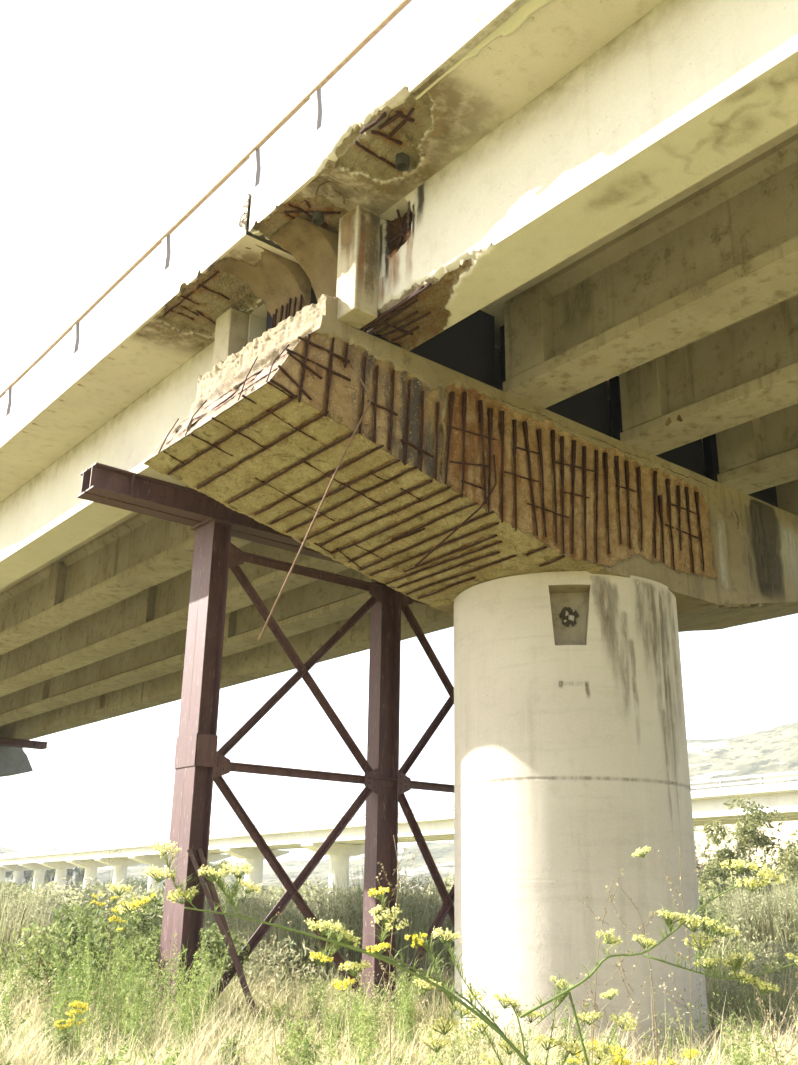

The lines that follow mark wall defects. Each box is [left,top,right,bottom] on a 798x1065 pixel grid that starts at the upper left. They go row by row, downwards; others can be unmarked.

spalling [318,0,566,181]
spalling [157,257,259,336]
spalling [271,294,303,328]
spalling [360,242,492,351]
spalling [145,324,716,607]
water stain [745,500,791,595]
water stain [594,578,636,692]
water stain [637,583,677,758]